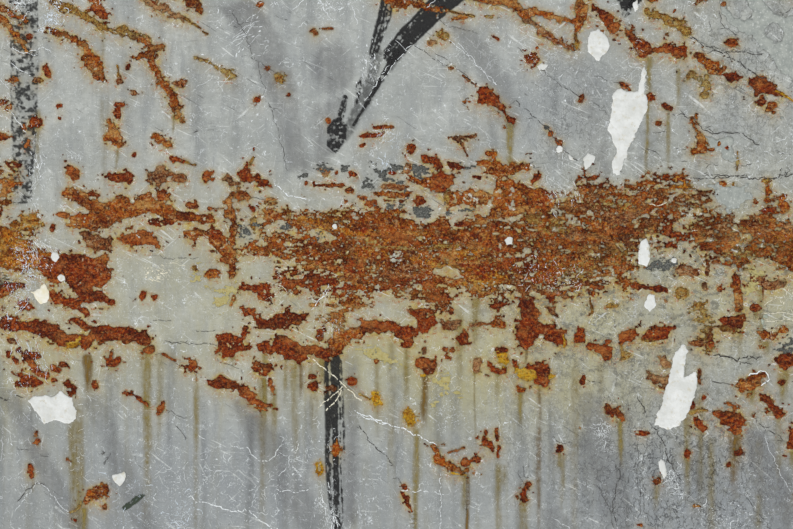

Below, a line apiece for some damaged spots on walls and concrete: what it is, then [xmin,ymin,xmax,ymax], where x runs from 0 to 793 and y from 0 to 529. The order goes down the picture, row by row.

corrosion [0,0,187,123]
corrosion [376,0,793,146]
peeling [587,29,610,61]
peeling [607,67,648,175]
corrosion [0,74,793,430]
peeling [28,391,77,424]
corrosion [66,426,117,527]
corrosion [424,443,482,529]
corrosion [475,428,501,458]
corrosion [604,397,629,451]
peeling [654,344,697,430]
corrosion [688,325,793,474]